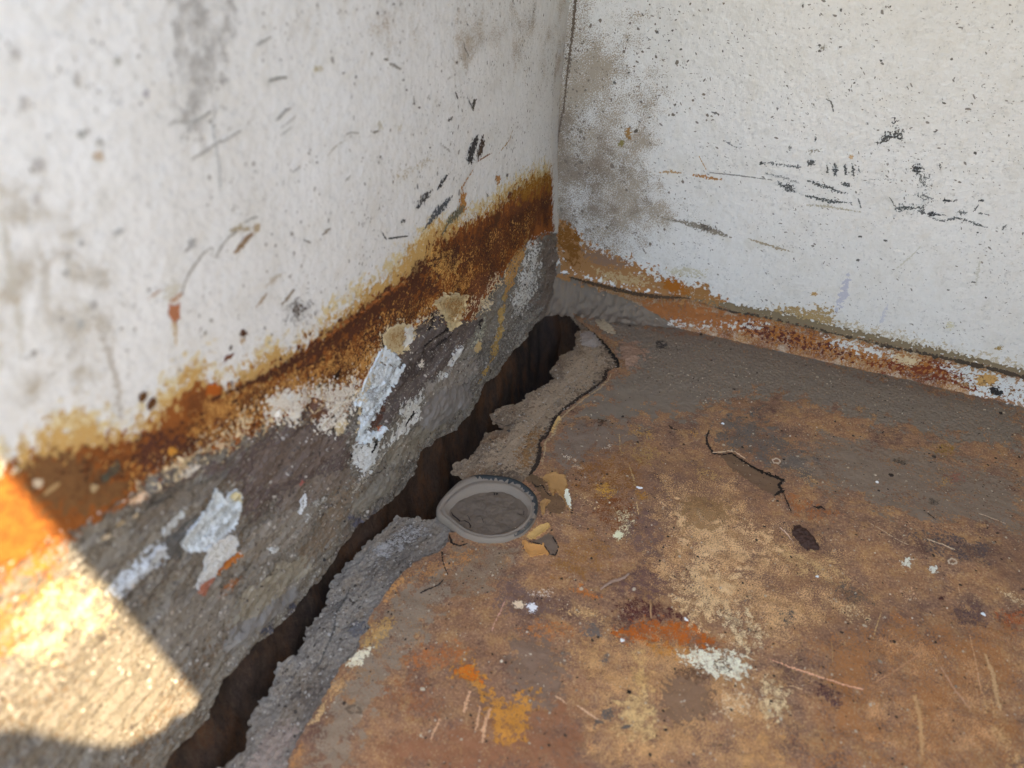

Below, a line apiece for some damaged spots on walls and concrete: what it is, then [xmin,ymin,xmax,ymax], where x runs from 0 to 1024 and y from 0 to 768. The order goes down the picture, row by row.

spalling [798,0,892,65]
spalling [749,67,1024,338]
crack [327,421,399,479]
spalling [0,0,771,768]
crack [423,313,453,351]
corrosion [0,155,1024,768]
crack [494,324,620,496]
crack [705,430,826,513]
crack [420,512,484,593]
crack [281,588,351,697]